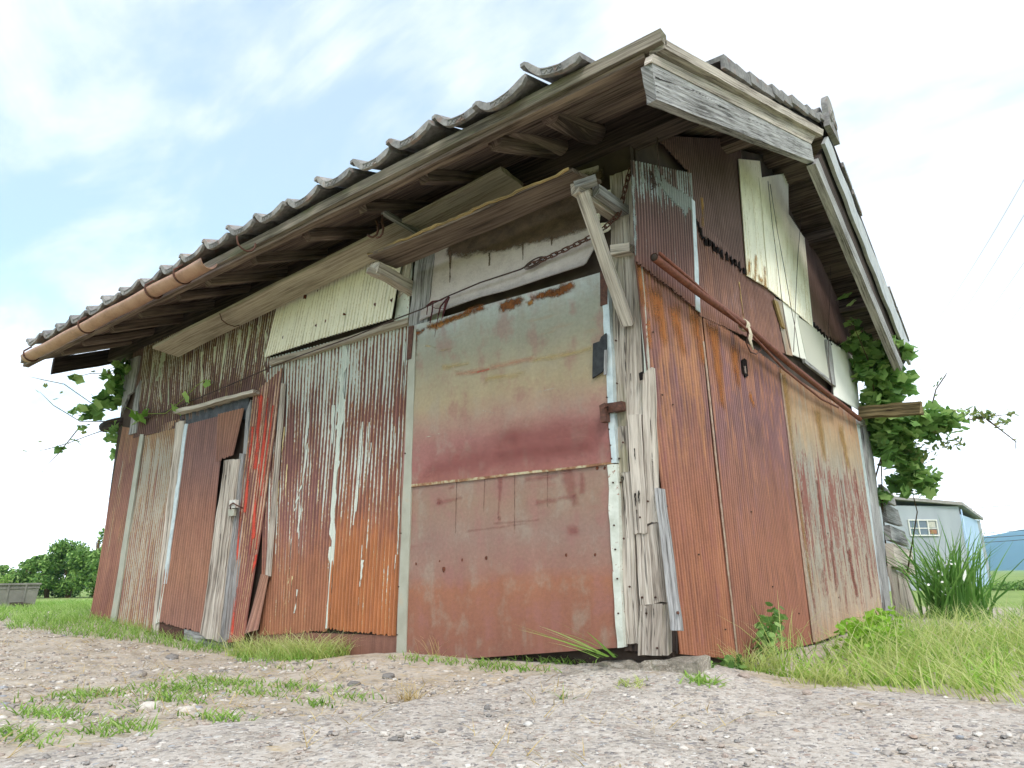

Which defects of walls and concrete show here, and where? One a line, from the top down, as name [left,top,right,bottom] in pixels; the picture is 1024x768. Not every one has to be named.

peeling [632,167,692,255]
rust [416,304,484,341]
rust [499,281,575,312]
rust [637,266,740,405]
peeling [277,406,310,558]
peeling [325,345,348,628]
peeling [353,422,372,525]